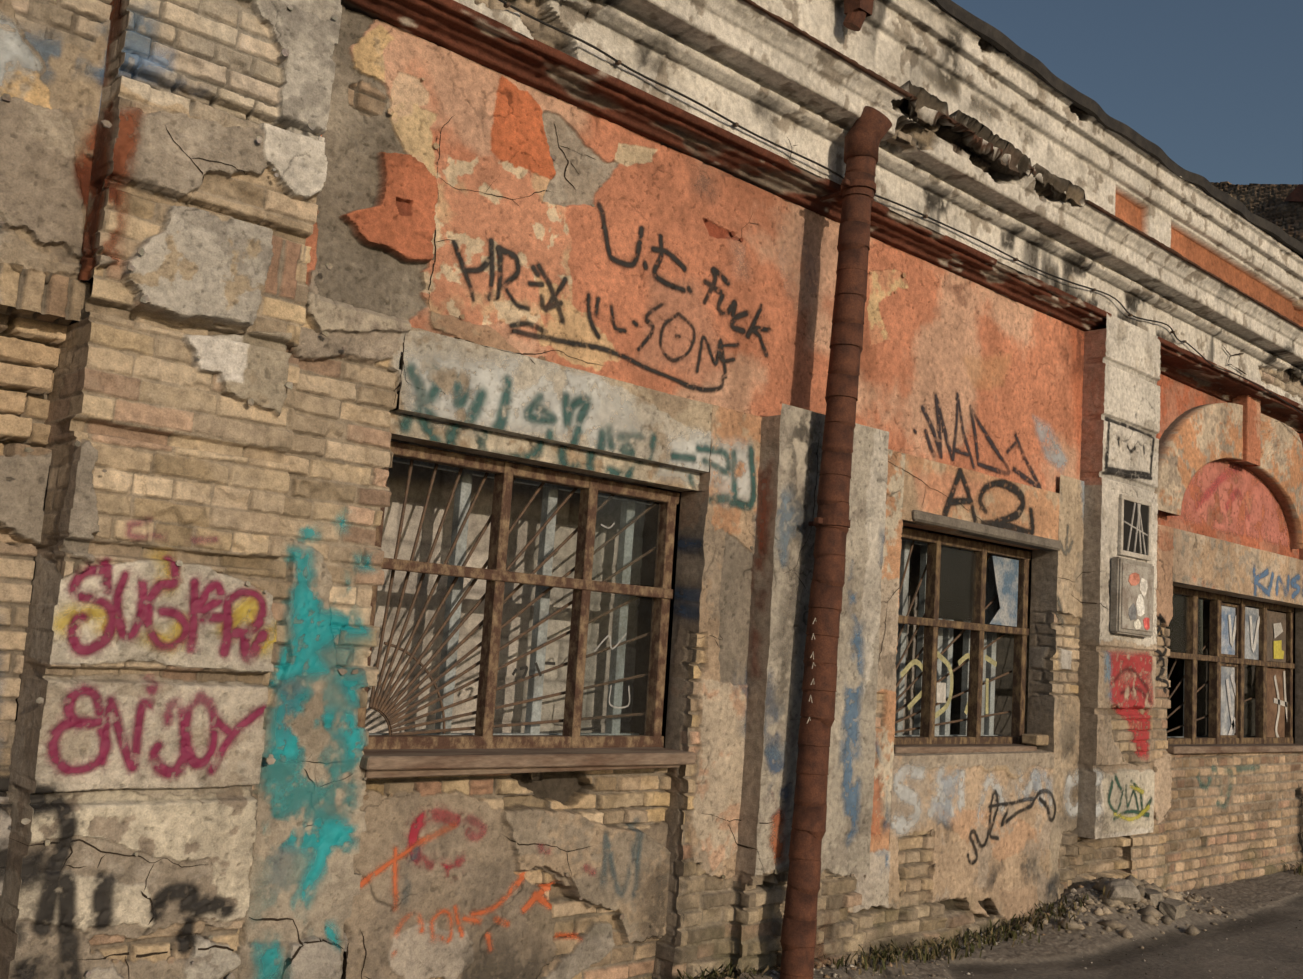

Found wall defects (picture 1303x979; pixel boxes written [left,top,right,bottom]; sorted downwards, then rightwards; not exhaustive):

corrosion [105,0,121,66]
flaking render [0,93,83,256]
corrosion [76,102,140,281]
spalling [100,0,520,353]
spalling [542,110,620,207]
spalling [891,80,1091,207]
flaking render [187,331,293,414]
crack [8,837,234,979]
crack [249,917,370,979]
flaking render [363,768,735,979]
spalling [898,829,999,921]